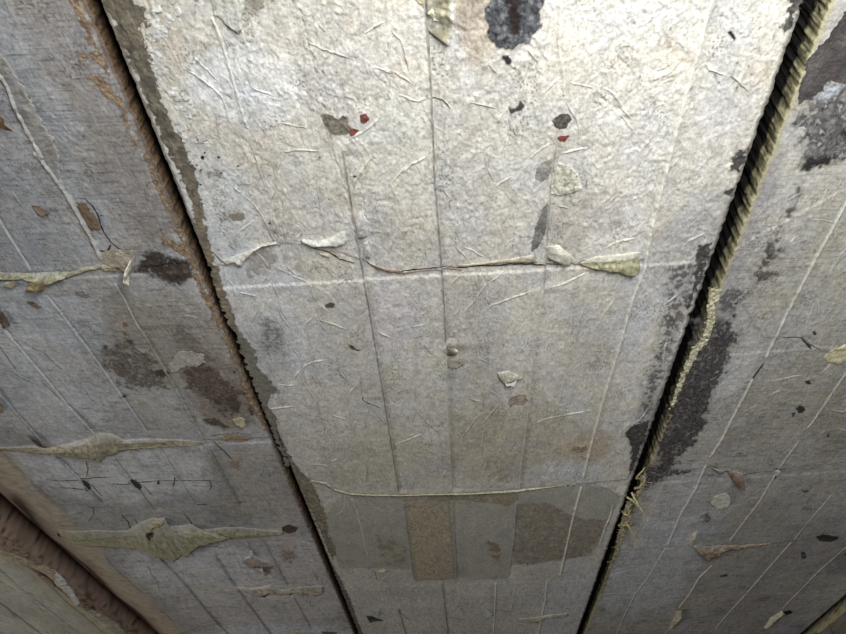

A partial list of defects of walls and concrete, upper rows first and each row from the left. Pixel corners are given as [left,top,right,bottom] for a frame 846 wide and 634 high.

mould [485,0,544,64]
peeling [0,53,60,180]
mould [793,81,846,171]
spalling [68,0,627,582]
crack [354,210,574,274]
water stain [754,239,784,282]
water stain [639,264,752,490]
spalling [626,420,649,474]